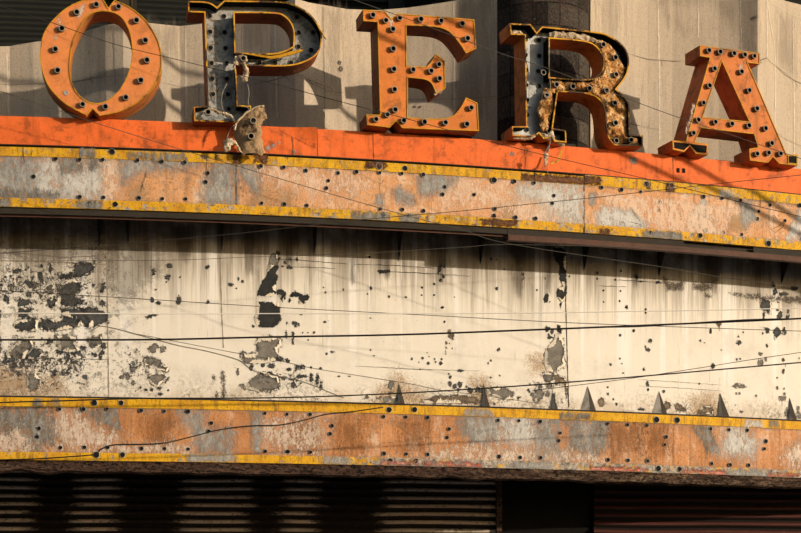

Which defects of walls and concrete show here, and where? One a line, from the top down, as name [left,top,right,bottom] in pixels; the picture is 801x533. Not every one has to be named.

rust [253,154,270,164]
rust [364,161,388,170]
rust [521,172,602,185]
peeling [536,246,570,307]
damp [661,275,714,298]
damp [728,292,801,304]
peeling [361,320,648,472]